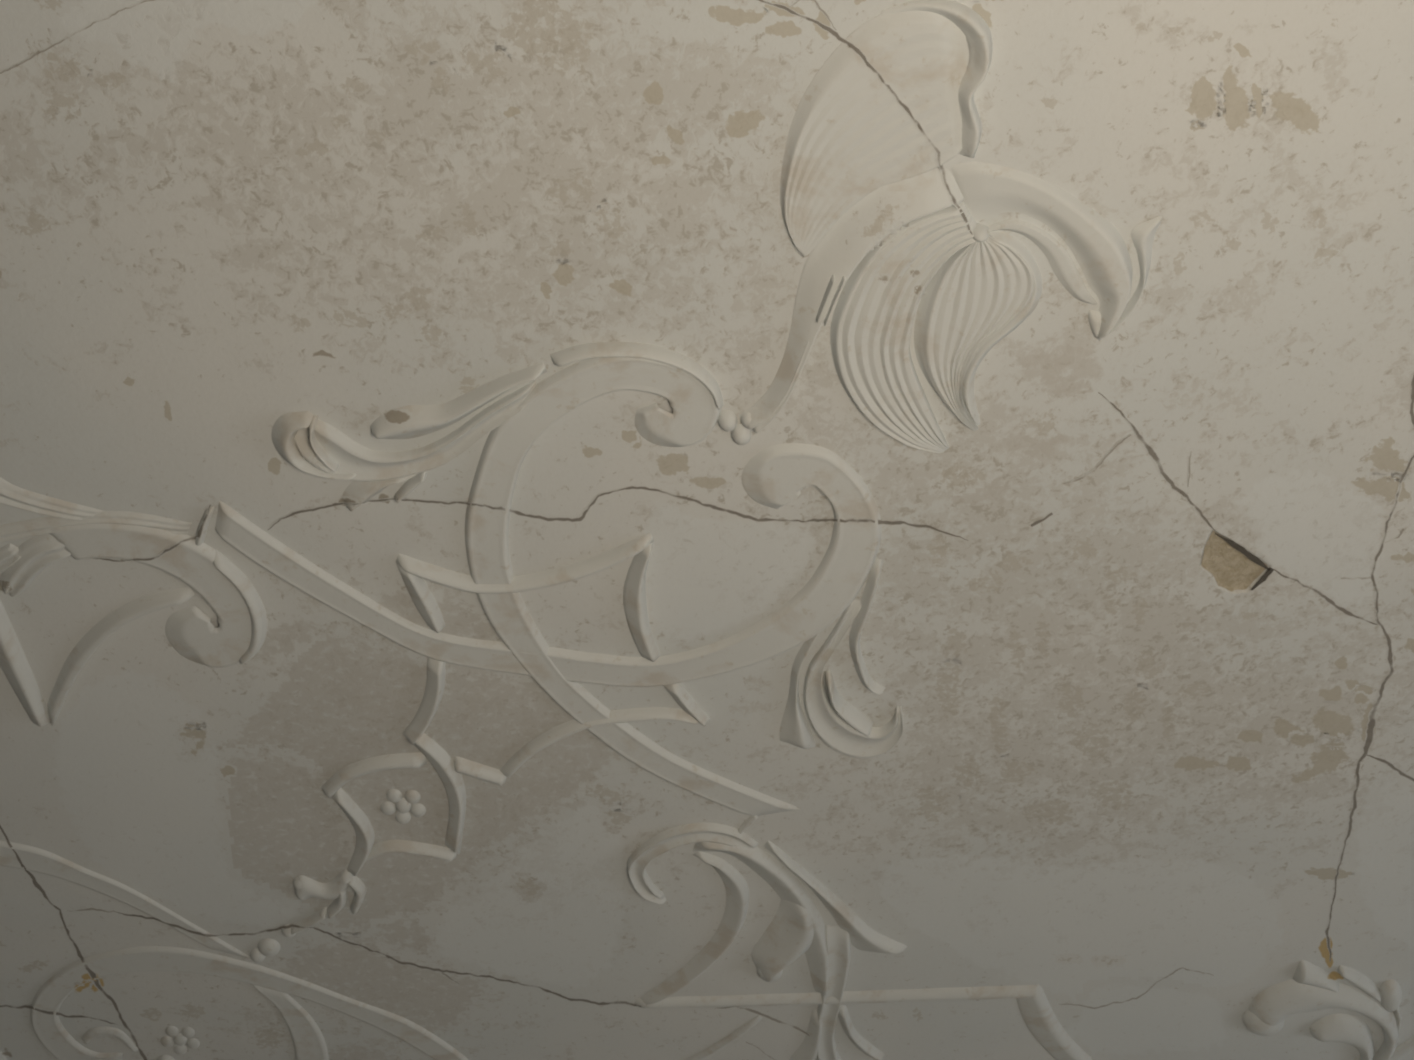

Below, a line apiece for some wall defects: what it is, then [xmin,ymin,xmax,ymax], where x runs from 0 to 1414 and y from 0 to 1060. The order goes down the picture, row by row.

crack [0,0,155,74]
crack [757,0,973,235]
peeling [1180,41,1332,142]
crack [1030,392,1215,530]
crack [92,505,211,562]
crack [268,486,969,541]
spalling [1201,530,1274,592]
crack [1272,374,1414,962]
crack [0,825,641,1060]